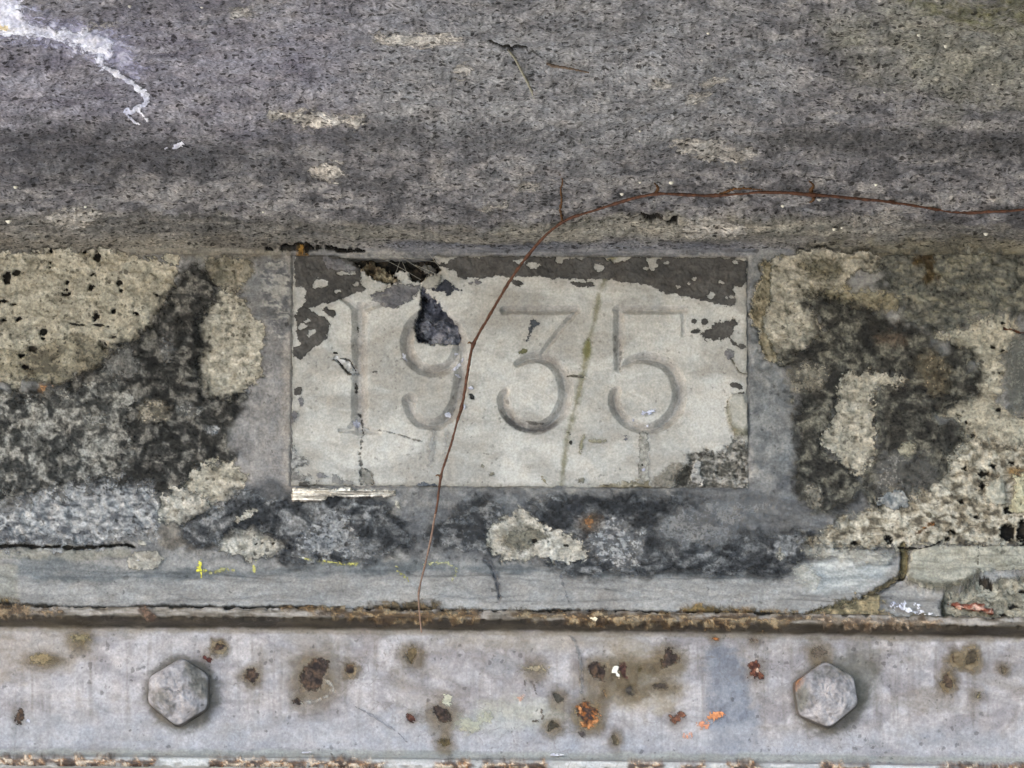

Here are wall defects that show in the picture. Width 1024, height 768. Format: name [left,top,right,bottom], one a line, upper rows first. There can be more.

peeling [292,246,900,366]
leakage [0,263,248,555]
leakage [782,245,1024,515]
crack [0,542,135,550]
spalling [218,527,284,563]
spalling [486,505,589,565]
leakage [587,516,643,569]
crack [804,541,941,615]
rust [280,605,481,627]
rust [512,609,942,641]
rust [292,653,360,705]
rust [532,645,684,747]